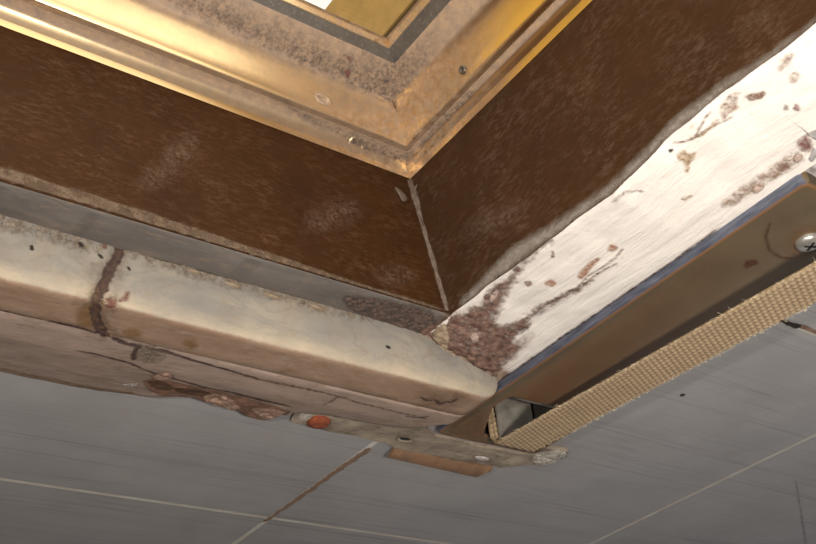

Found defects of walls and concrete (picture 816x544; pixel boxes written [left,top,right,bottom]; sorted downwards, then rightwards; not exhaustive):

flaking render [724,136,816,204]
crack [0,248,456,418]
spalling [123,373,289,420]